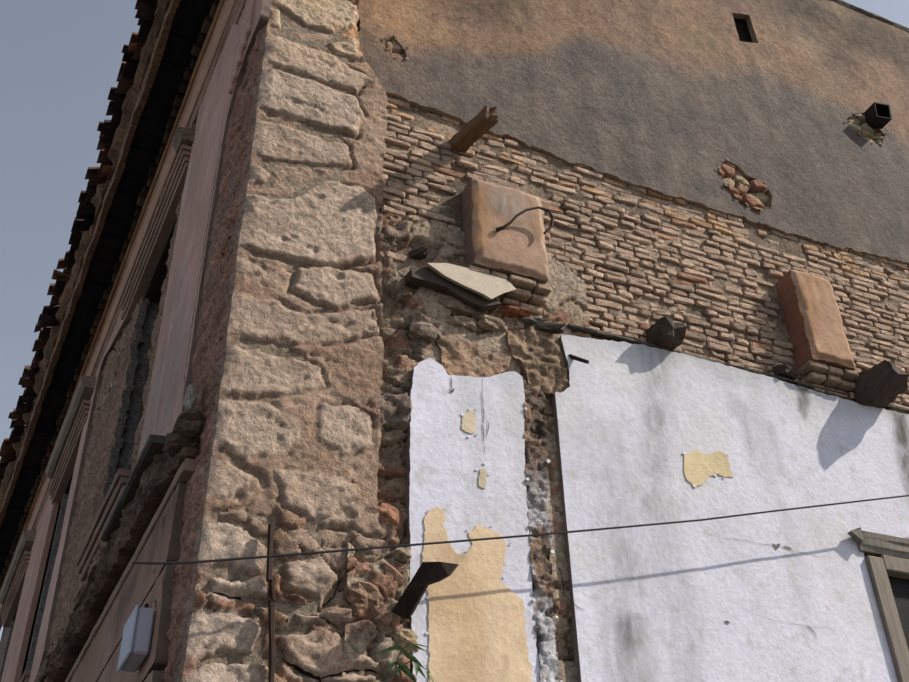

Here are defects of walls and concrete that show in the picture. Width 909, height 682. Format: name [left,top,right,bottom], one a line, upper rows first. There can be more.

flaking render [845,111,888,146]
flaking render [717,157,776,212]
peeling [461,409,477,438]
peeling [475,462,490,489]
crack [481,379,489,451]
peeling [683,450,733,488]
damp [899,417,909,478]
crack [523,380,583,682]
crack [710,535,819,557]
peeling [421,507,534,682]